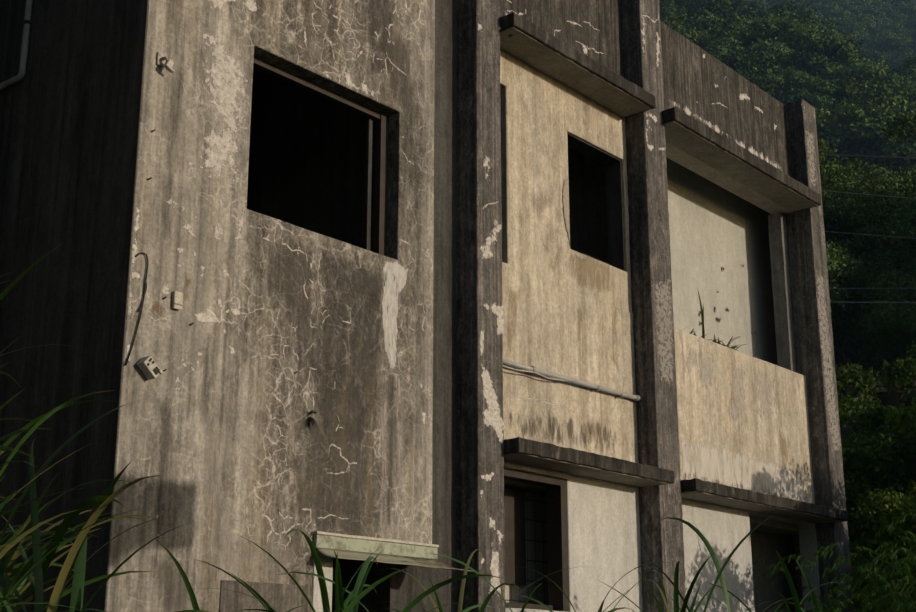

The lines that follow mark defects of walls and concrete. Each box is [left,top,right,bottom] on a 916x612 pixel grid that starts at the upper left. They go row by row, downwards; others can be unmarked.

peeling [211,0,257,12]
crack [300,0,425,77]
peeling [188,28,248,184]
peeling [214,216,244,248]
crack [255,235,351,410]
peeling [382,261,409,369]
peeling [483,303,505,337]
peeling [479,331,505,446]
crack [265,425,287,485]
crack [329,415,357,474]
damp [522,415,611,450]
crack [246,506,349,550]